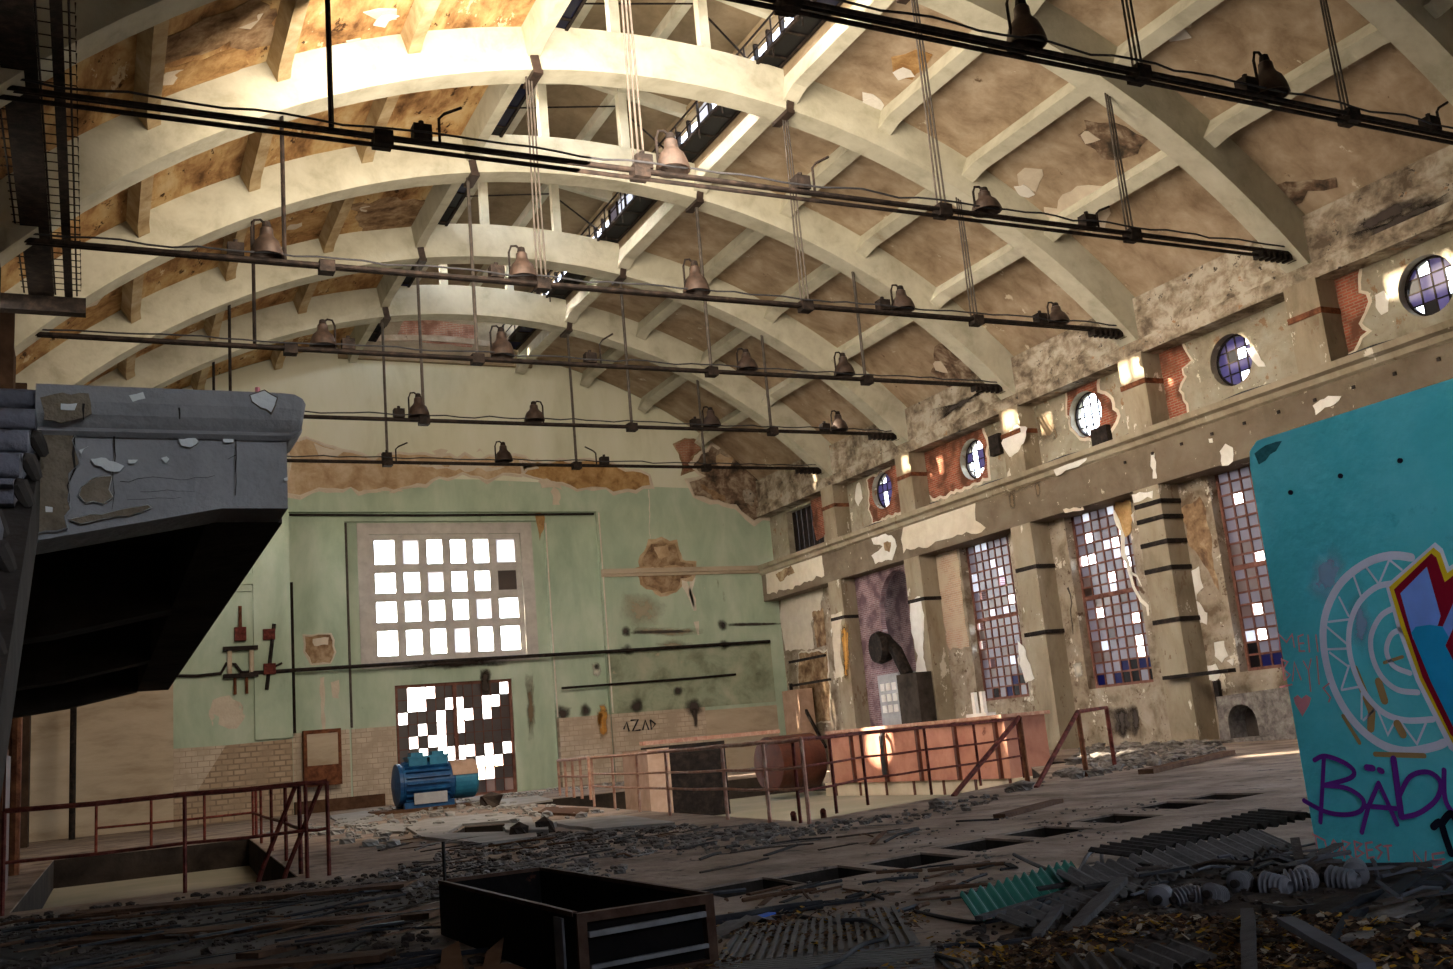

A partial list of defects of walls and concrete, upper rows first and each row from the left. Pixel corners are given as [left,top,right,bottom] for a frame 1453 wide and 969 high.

flaking render [162,0,277,97]
flaking render [346,8,399,43]
leakage [1355,197,1447,236]
flaking render [1334,268,1389,354]
peeling [34,392,152,534]
peeling [284,436,655,538]
spalling [673,438,770,527]
flaking render [1054,378,1120,476]
flaking render [1159,343,1194,419]
spalling [637,537,699,635]
peeling [910,596,927,672]
flaking render [855,425,1027,650]